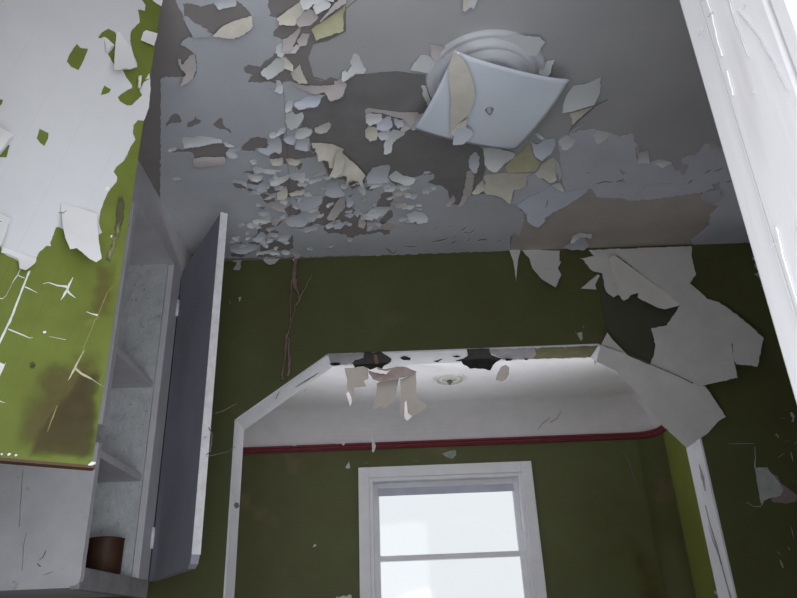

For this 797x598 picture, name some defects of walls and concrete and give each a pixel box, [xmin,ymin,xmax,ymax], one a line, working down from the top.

peeling [0,0,750,270]
crack [0,269,114,387]
water stain [27,363,97,456]
spalling [352,352,411,374]
spalling [452,348,513,370]